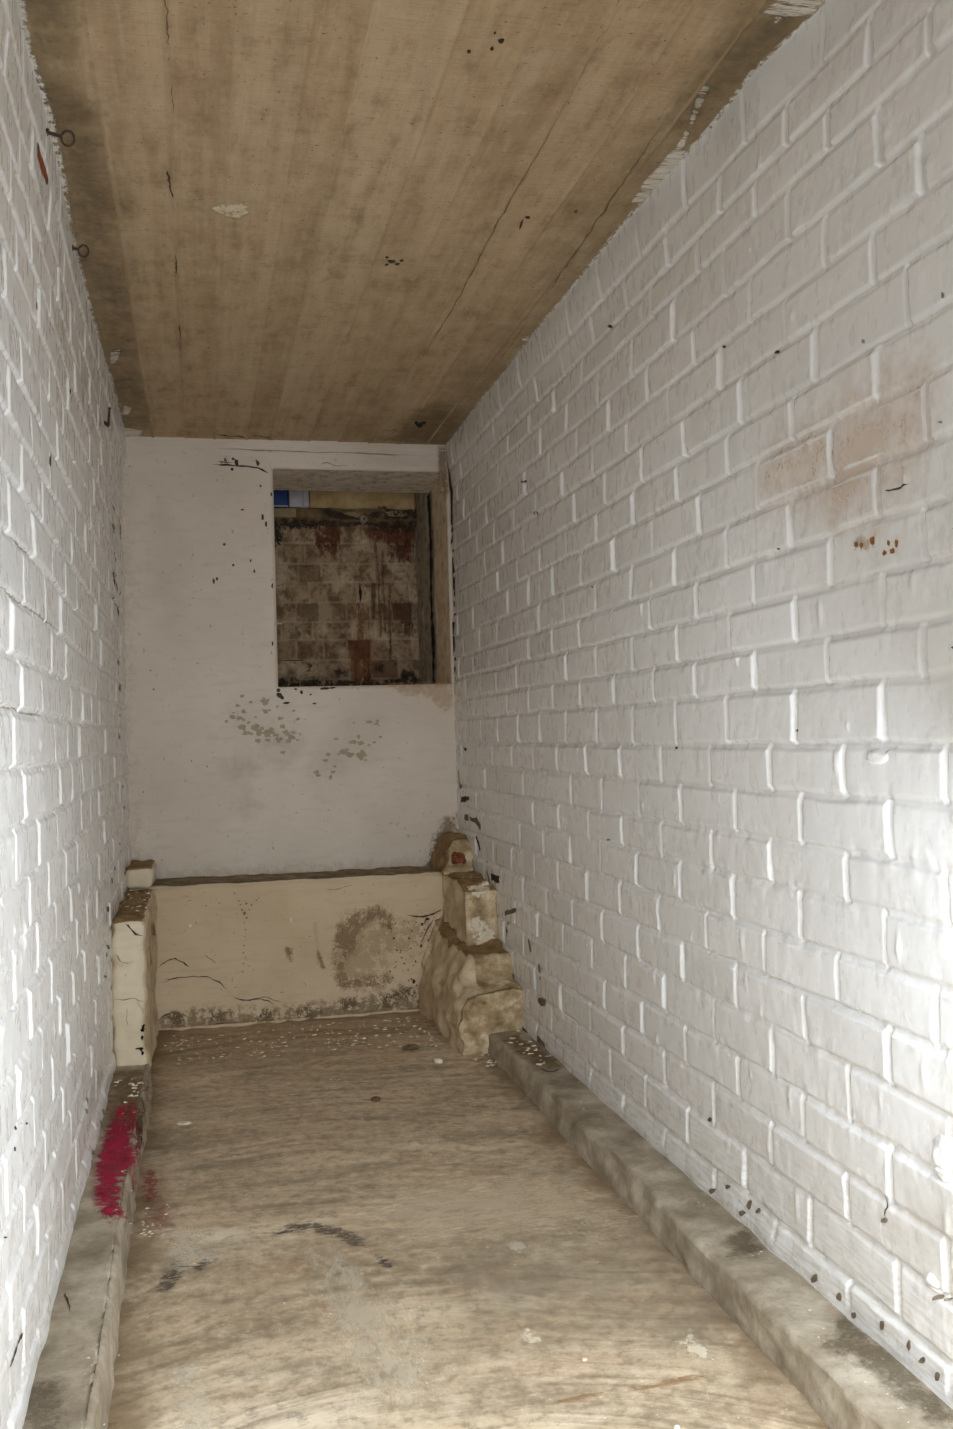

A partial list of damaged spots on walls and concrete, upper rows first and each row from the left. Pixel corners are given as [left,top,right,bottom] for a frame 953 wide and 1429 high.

corrosion [314,525,340,557]
corrosion [365,527,414,563]
corrosion [346,603,372,685]
peeling [225,687,336,754]
water stain [160,907,435,1029]